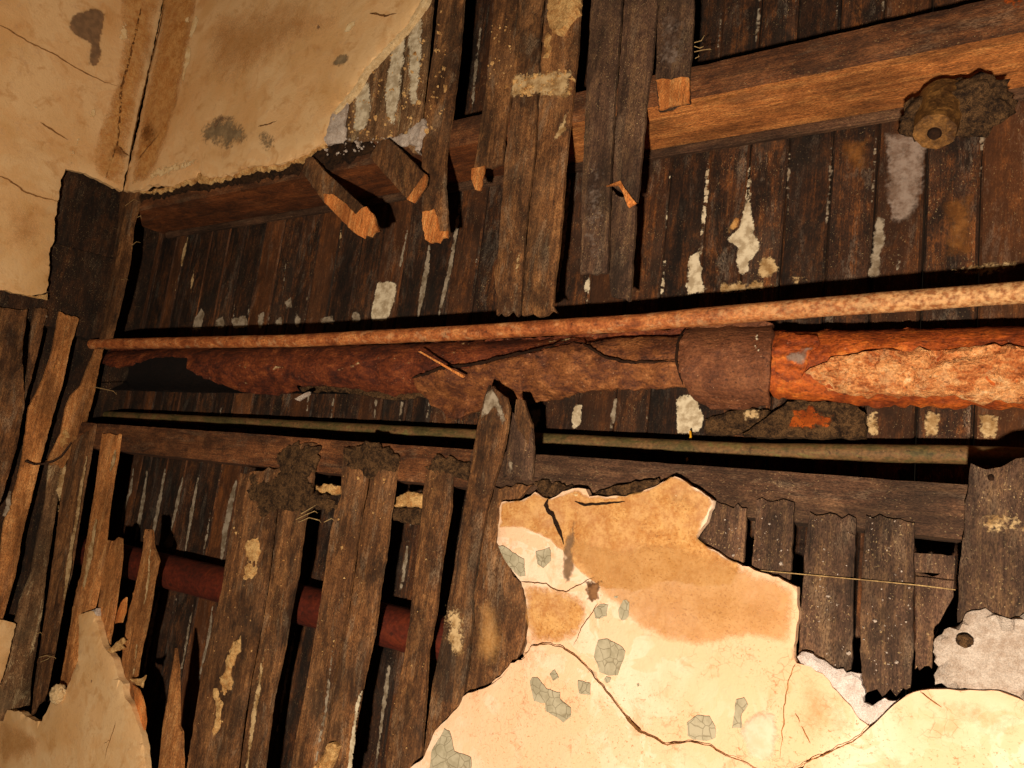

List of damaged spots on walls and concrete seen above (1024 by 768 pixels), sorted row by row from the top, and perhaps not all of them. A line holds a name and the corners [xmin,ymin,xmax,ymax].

leakage [70,9,104,66]
crack [0,7,164,181]
leakage [204,116,244,149]
rust [414,336,686,419]
rust [805,344,1024,406]
rust [789,406,830,429]
peeling [593,478,660,497]
crack [544,499,625,544]
leakage [500,478,788,641]
peeling [594,639,625,683]
crack [523,605,753,768]
peeling [429,729,472,768]